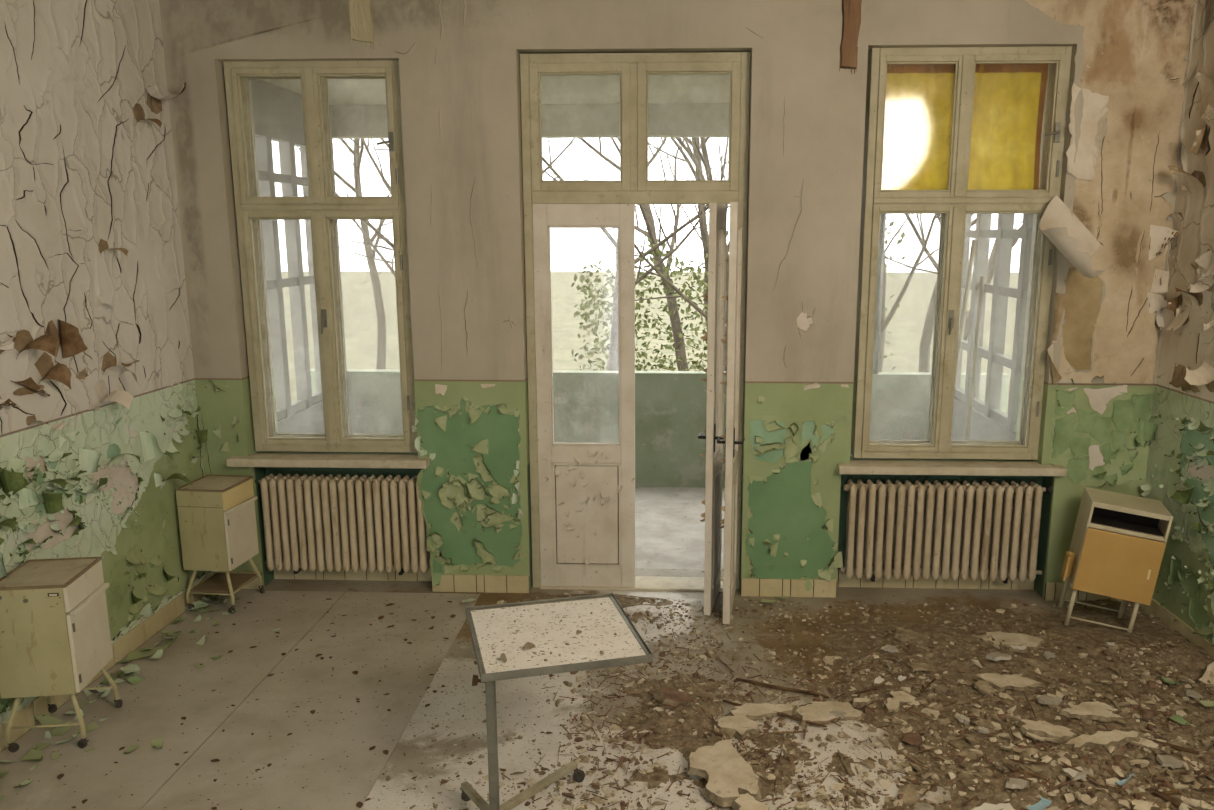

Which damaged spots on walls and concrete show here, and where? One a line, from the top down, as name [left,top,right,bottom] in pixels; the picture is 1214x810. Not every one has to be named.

crack [0,0,181,437]
peeling [98,239,129,259]
peeling [133,82,186,128]
crack [1097,118,1108,238]
crack [1150,81,1214,214]
spalling [1010,0,1214,646]
crack [1125,286,1149,377]
crack [1194,332,1202,365]
peeling [0,319,241,644]
peeling [412,384,526,588]
peeling [742,396,843,591]
peeling [0,693,38,721]